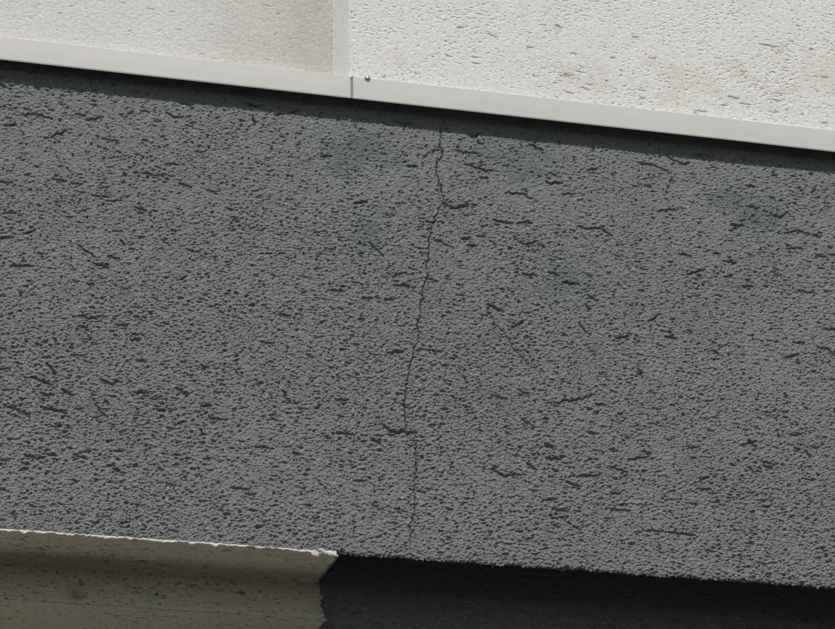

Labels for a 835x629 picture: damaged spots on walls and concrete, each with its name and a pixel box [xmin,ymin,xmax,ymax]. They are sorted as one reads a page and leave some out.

crack [385,134,460,547]